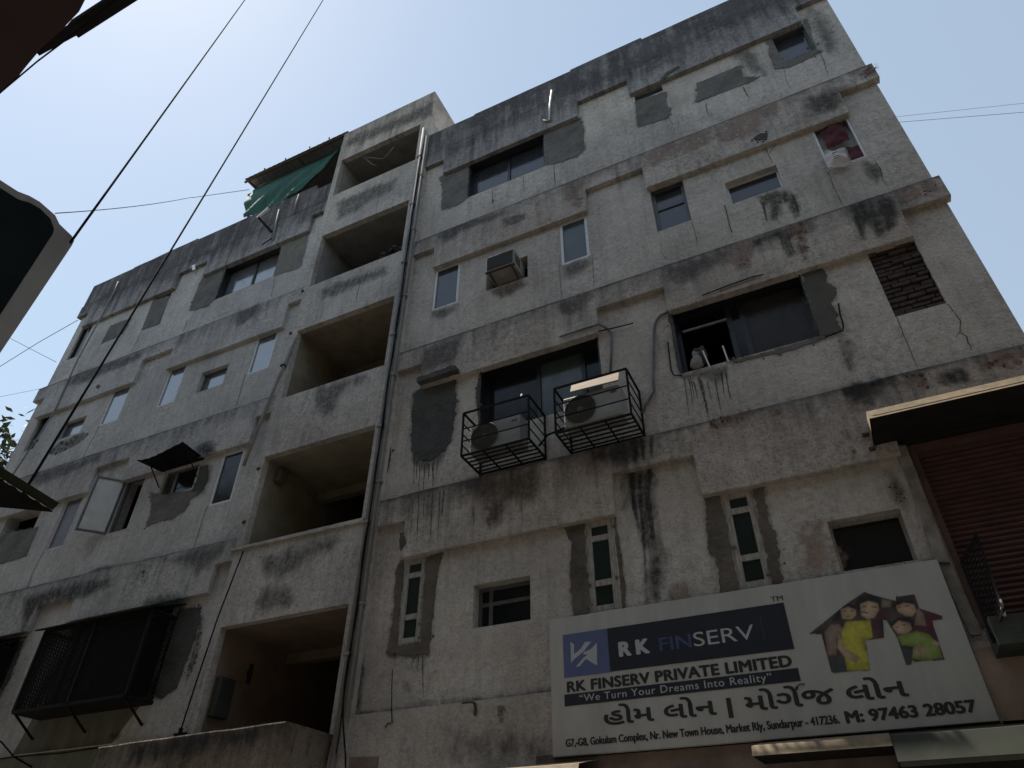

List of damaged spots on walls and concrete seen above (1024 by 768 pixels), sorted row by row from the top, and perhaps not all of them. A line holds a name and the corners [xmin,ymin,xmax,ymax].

crack [948,304,972,350]
leakage [683,368,731,414]
leakage [597,440,661,598]